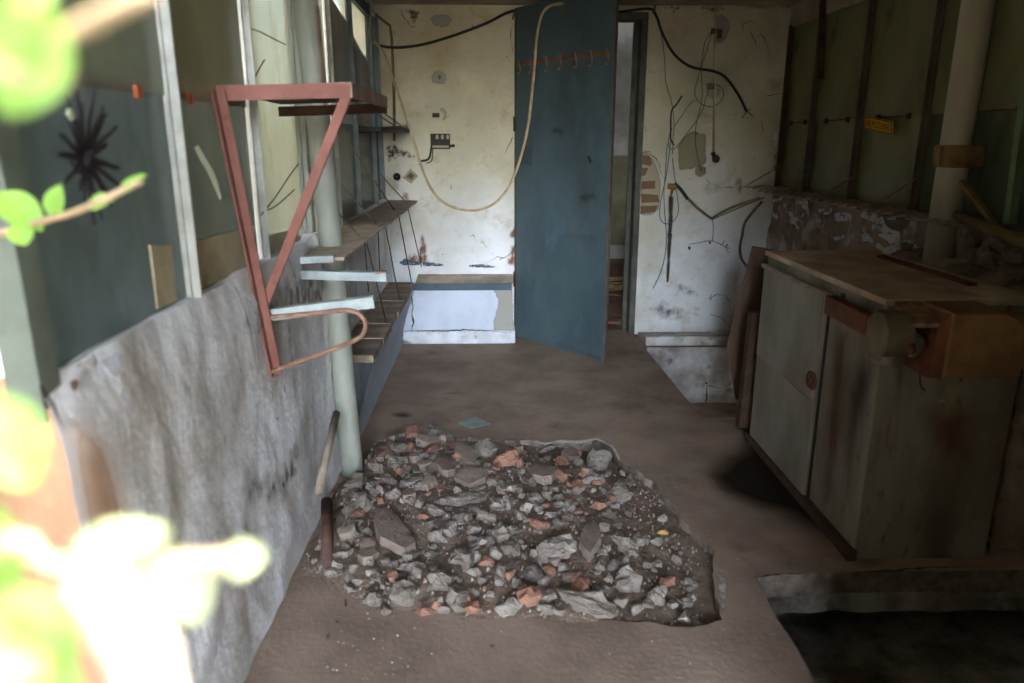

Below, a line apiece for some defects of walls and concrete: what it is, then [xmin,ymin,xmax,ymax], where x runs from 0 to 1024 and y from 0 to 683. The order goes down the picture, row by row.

flaking render [640,153,660,215]
peeling [772,197,918,254]
peeling [494,290,514,330]